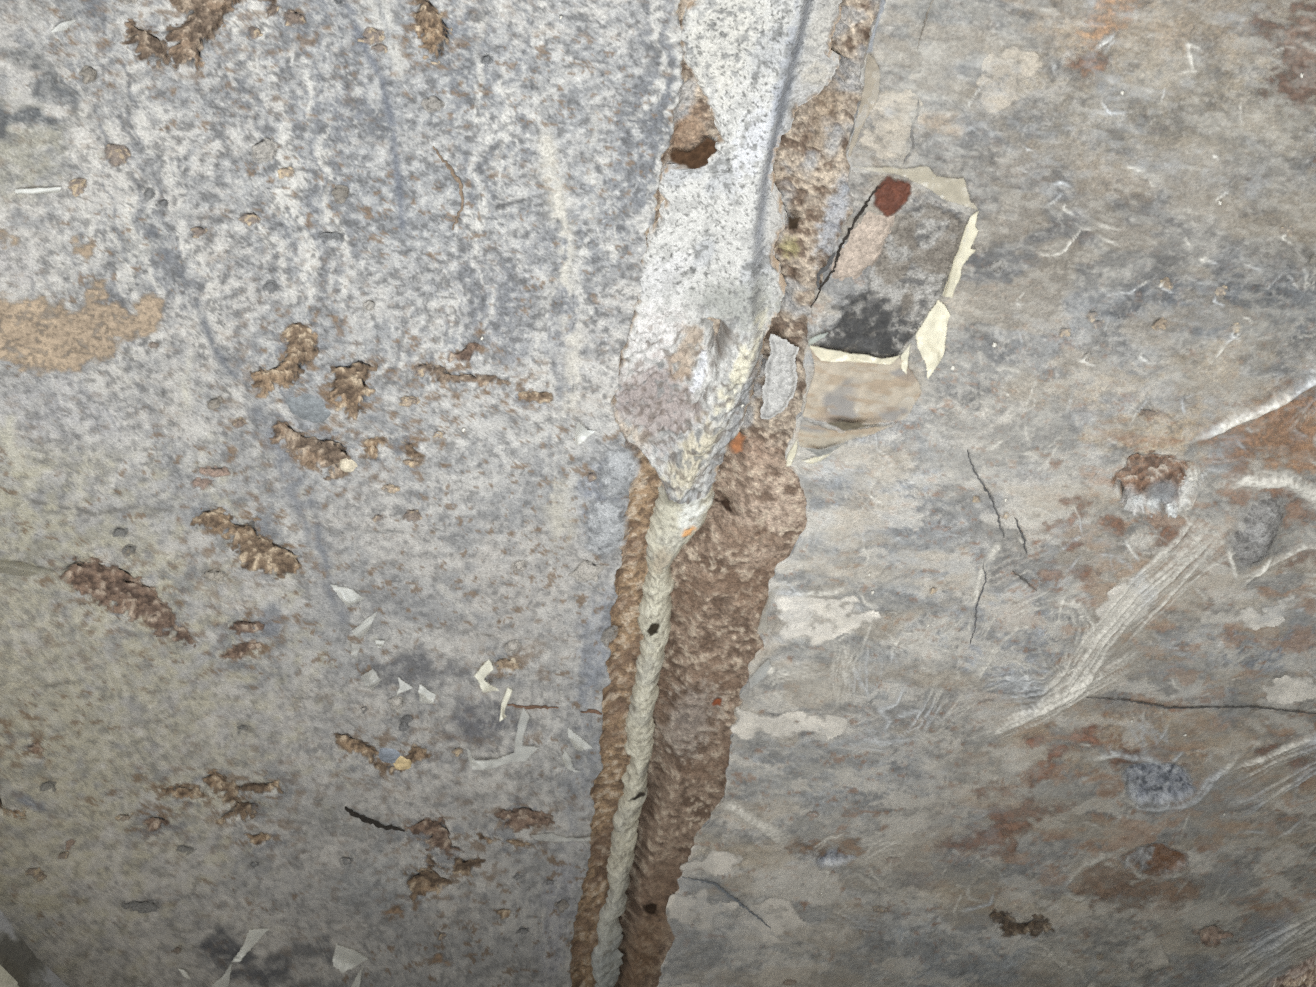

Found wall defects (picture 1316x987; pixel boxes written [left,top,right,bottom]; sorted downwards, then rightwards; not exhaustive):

spalling [121,0,240,71]
spalling [246,0,306,40]
corrosion [1251,1,1316,118]
spalling [554,0,965,987]
spalling [190,507,301,580]
spalling [60,528,196,648]
spalling [161,769,283,845]
spalling [403,817,486,901]
spalling [476,808,555,847]